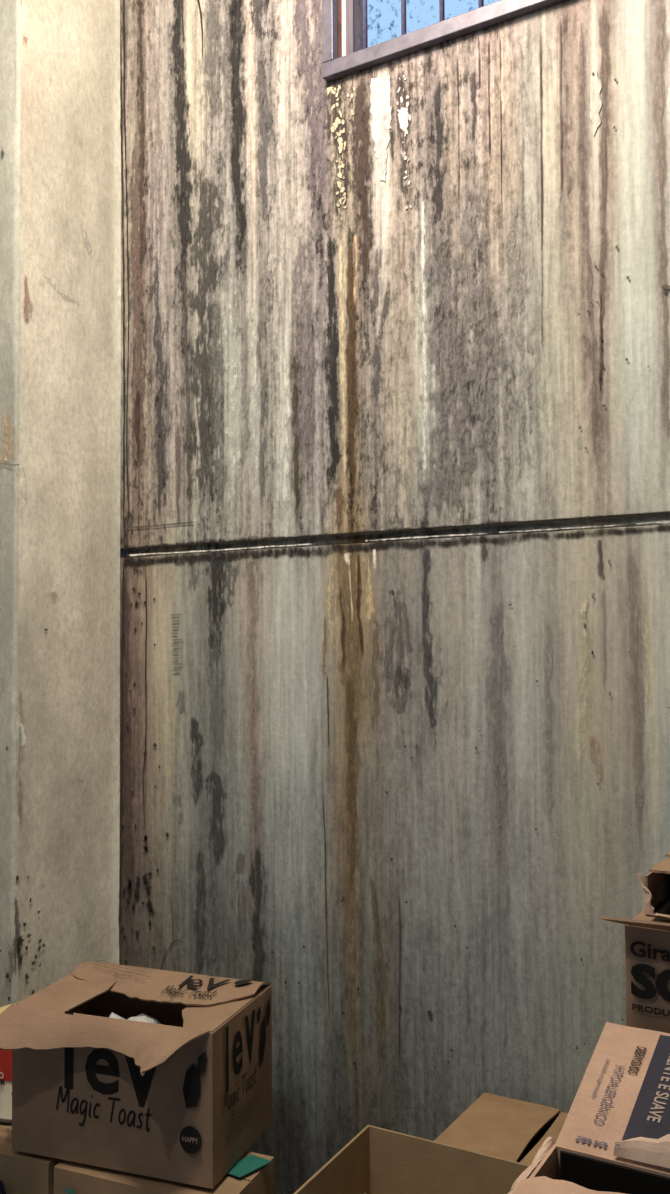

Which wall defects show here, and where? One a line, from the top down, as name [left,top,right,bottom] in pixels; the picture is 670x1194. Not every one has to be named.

damp [128,0,273,523]
damp [281,238,343,507]
peeling [327,85,355,221]
damp [295,0,390,405]
rust [336,235,358,528]
peeling [370,75,412,185]
damp [390,73,411,195]
damp [418,37,543,510]
damp [579,13,610,446]
damp [654,7,670,436]
rust [322,552,379,1029]
damp [120,513,670,982]